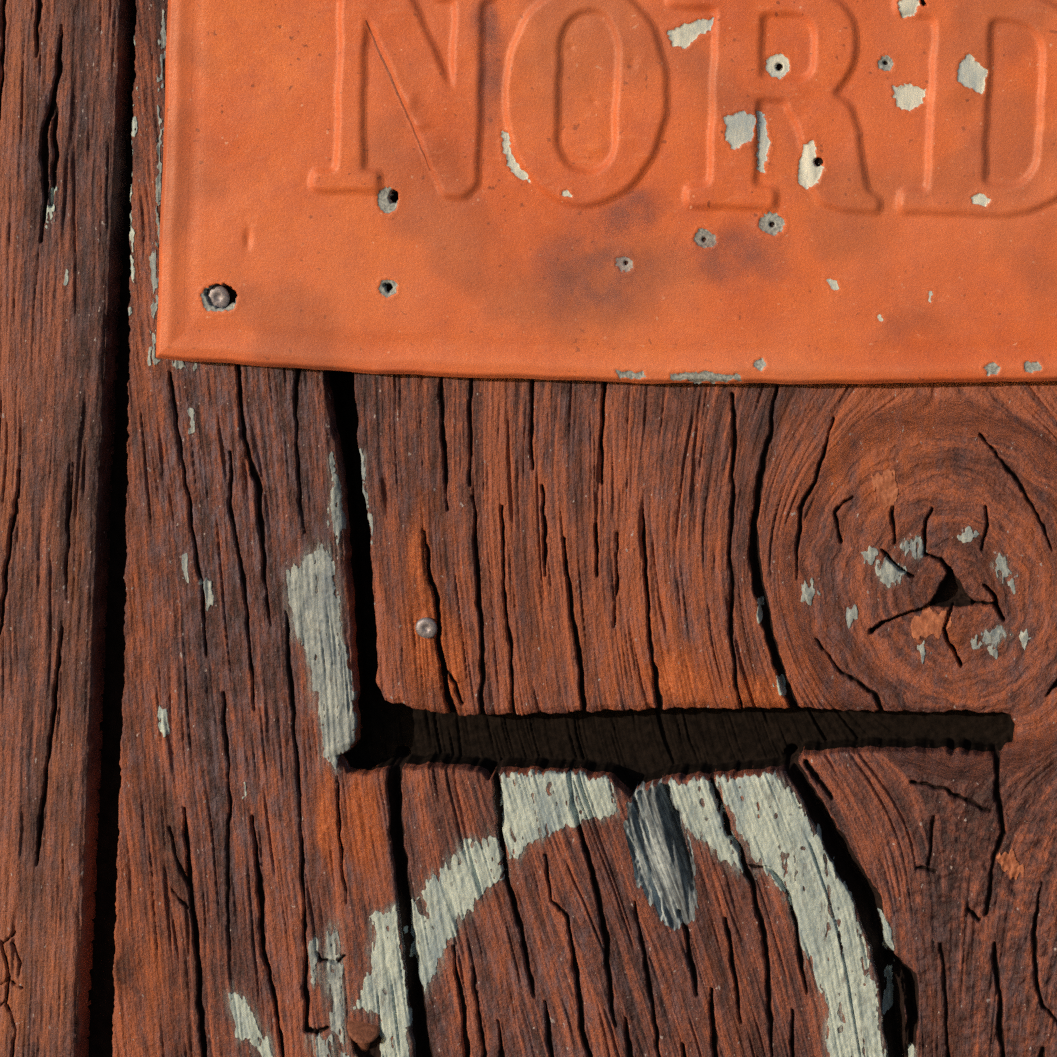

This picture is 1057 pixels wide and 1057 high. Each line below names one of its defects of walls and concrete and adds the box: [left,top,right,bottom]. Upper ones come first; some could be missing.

crack [36,0,63,243]
peeling [667,17,714,49]
peeling [723,111,771,173]
peeling [798,140,824,189]
peeling [892,83,926,111]
peeling [957,54,988,94]
crack [223,364,347,1057]
peeling [286,452,358,769]
crack [425,377,516,714]
crack [530,379,587,710]
crack [728,386,799,708]
crack [869,506,1005,665]